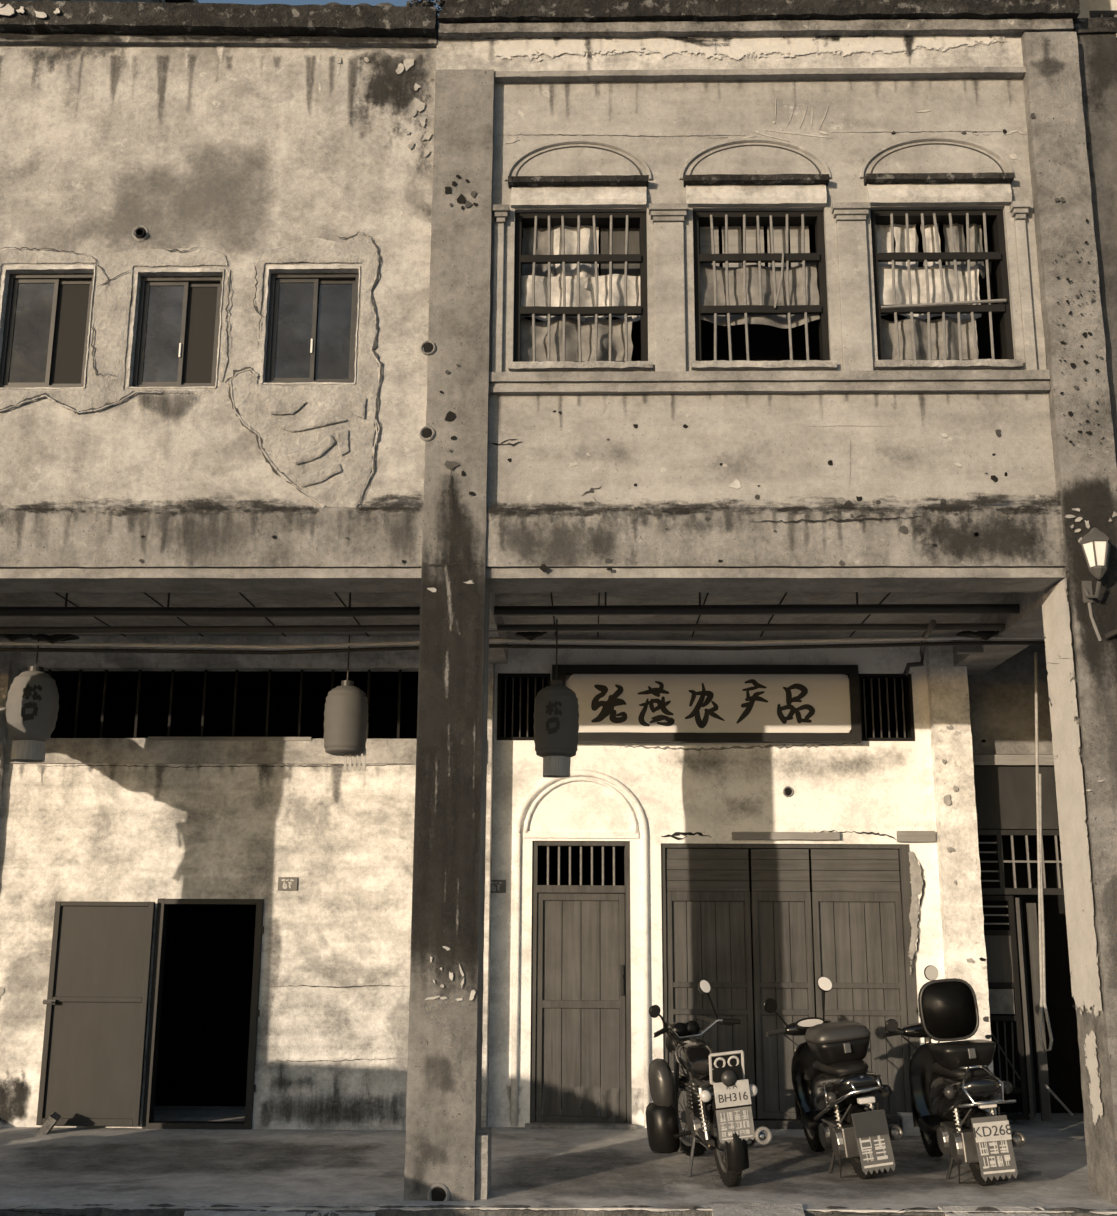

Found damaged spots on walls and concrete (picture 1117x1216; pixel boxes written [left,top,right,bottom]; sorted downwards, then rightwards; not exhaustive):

leakage [158,56,168,107]
leakage [288,35,427,123]
crack [0,247,162,414]
crack [225,264,325,508]
crack [337,231,383,505]
leakage [1,497,317,551]
leakage [358,491,422,548]
leakage [487,478,1117,778]
leakage [410,479,485,985]
leakage [332,766,340,802]
leakage [0,1074,30,1124]
leakage [269,1076,404,1122]